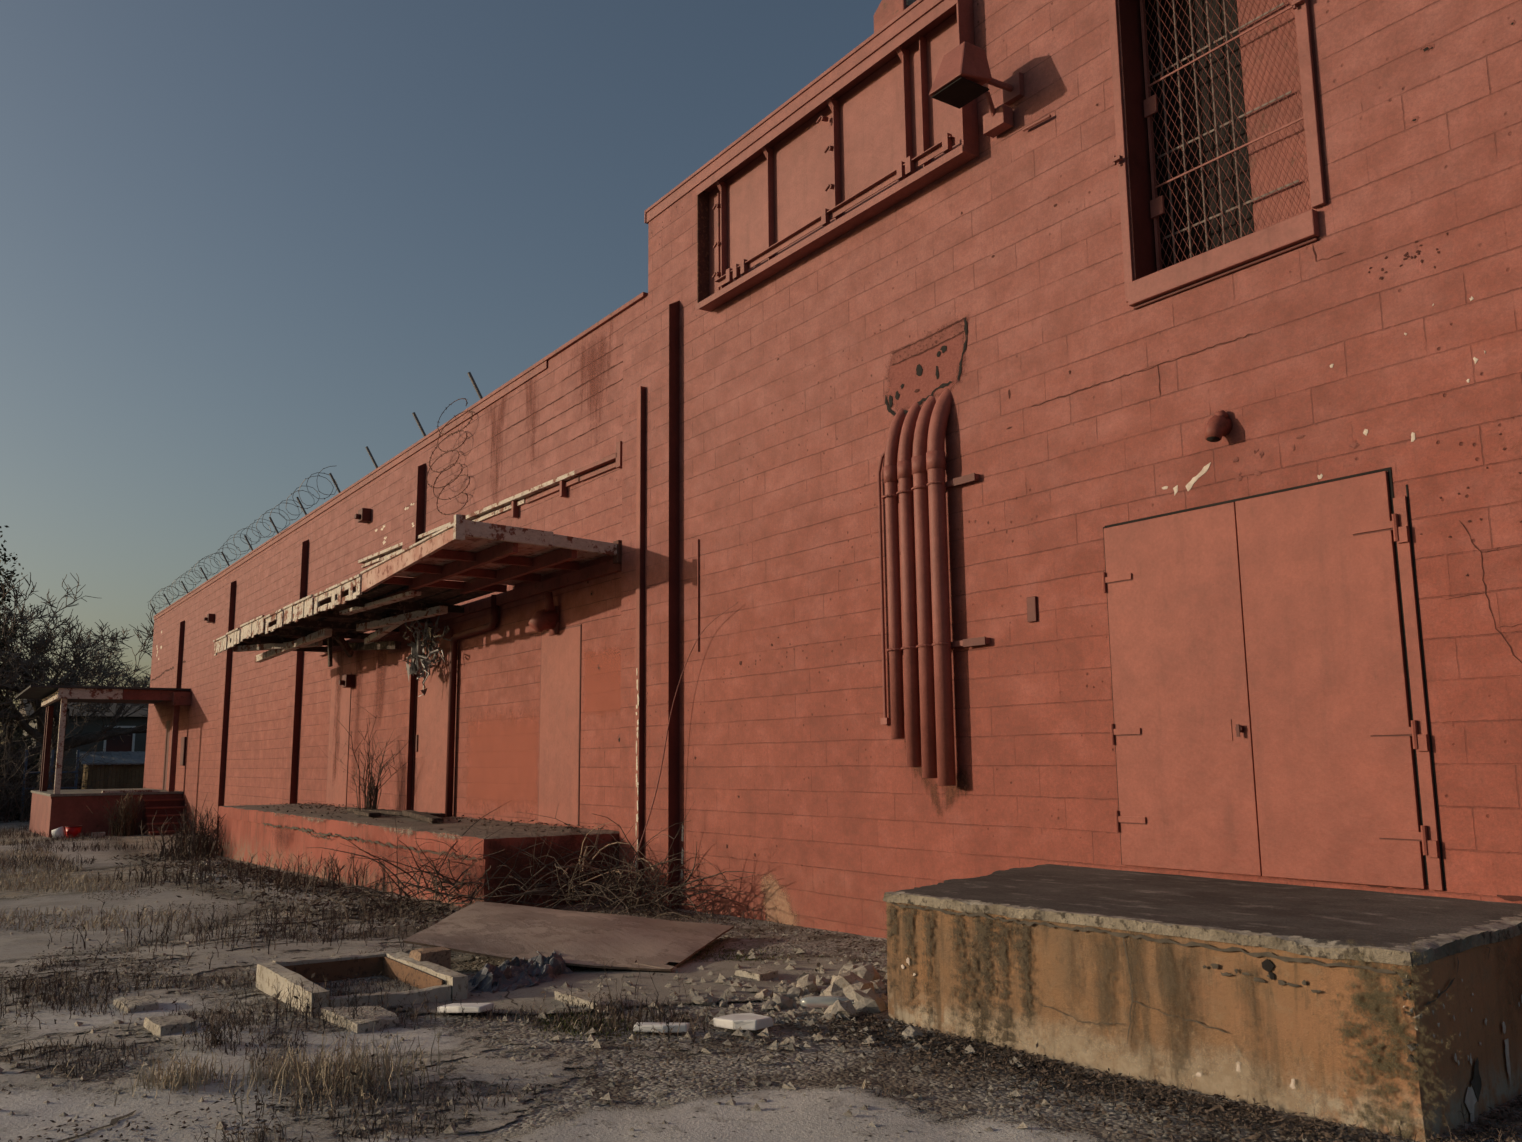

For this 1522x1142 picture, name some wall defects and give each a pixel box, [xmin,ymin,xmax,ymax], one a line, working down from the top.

spalling [885,317,968,416]
crack [1446,522,1522,663]
leakage [884,893,1321,1117]